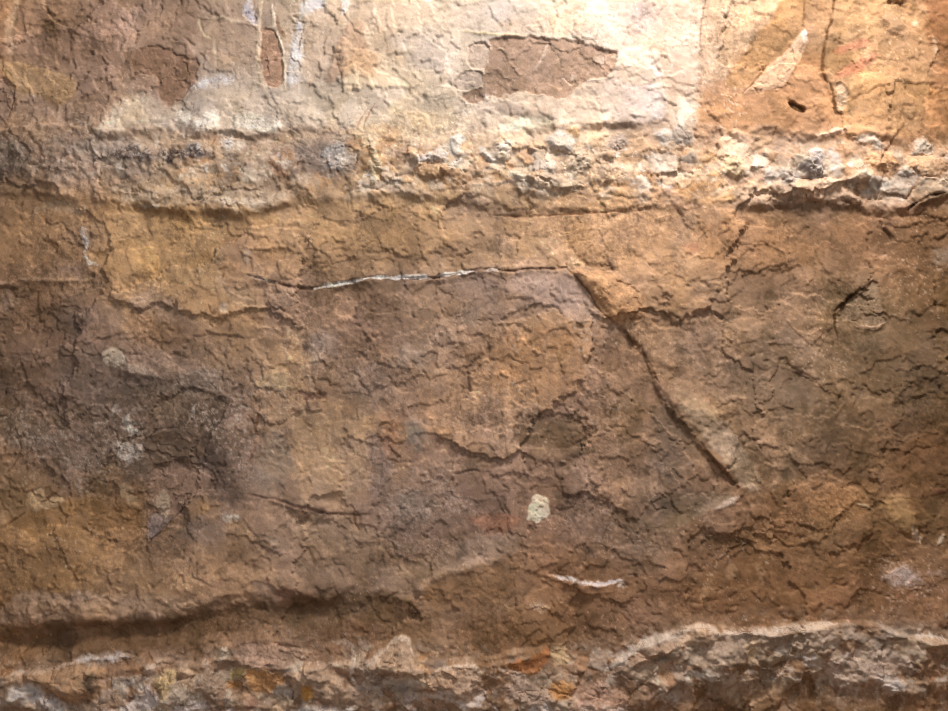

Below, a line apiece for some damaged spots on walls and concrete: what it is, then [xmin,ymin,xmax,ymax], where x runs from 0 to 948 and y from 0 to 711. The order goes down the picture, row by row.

flaking render [451,33,619,105]
crack [742,65,767,93]
crack [802,0,845,116]
crack [603,251,616,273]
crack [832,272,875,338]
crack [247,266,744,491]
crack [0,512,25,531]
leakage [71,649,138,668]
leakage [763,642,919,698]
leakage [0,679,72,711]
leakage [91,680,236,711]